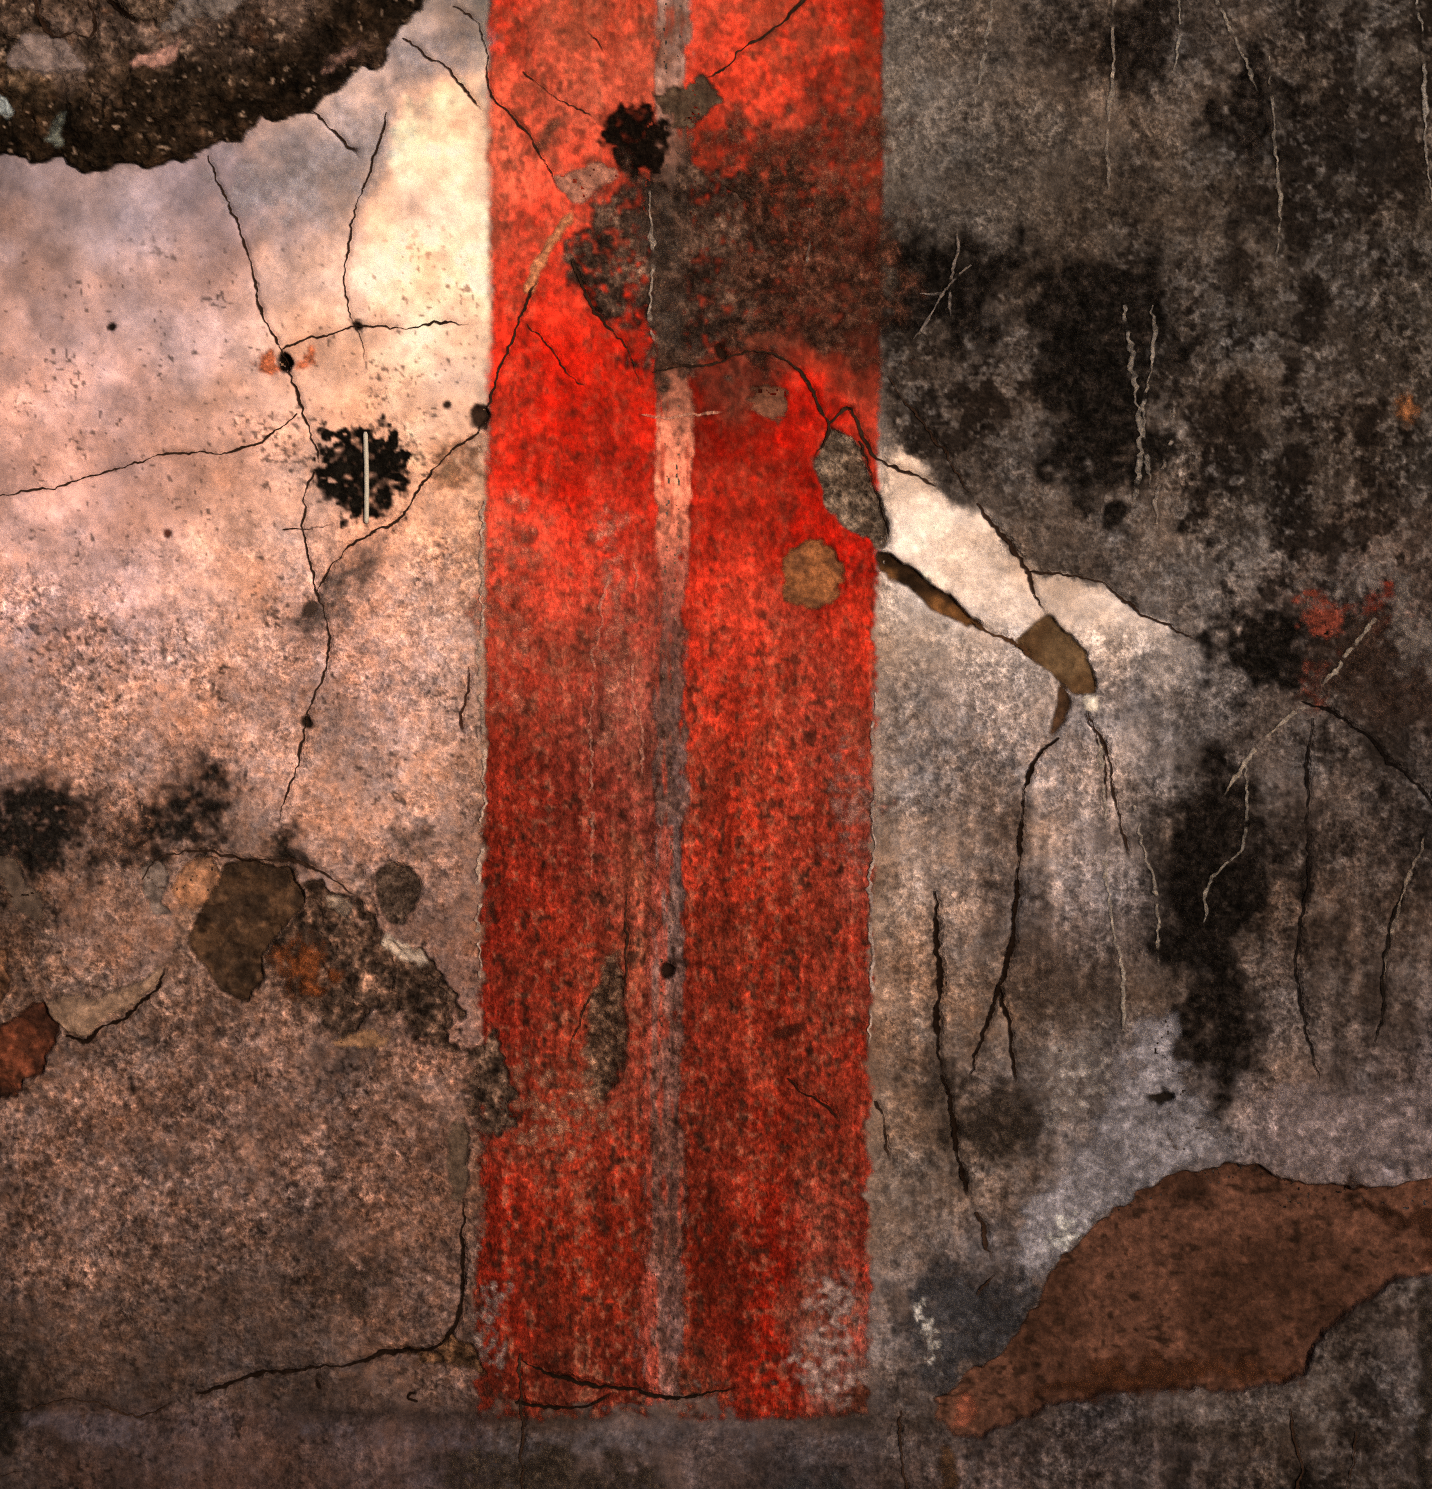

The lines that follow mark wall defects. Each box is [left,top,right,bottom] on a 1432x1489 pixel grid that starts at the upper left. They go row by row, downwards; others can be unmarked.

crack [403,6,556,183]
crack [0,109,585,819]
mould [312,414,425,529]
water stain [563,99,1194,530]
crack [571,259,1194,639]
mould [0,753,231,880]
spalling [1017,615,1099,734]
spalling [0,968,163,1098]
spalling [141,857,628,1201]
crack [933,712,1129,1294]
water stain [893,743,1310,1396]
spalling [935,1162,1432,1437]